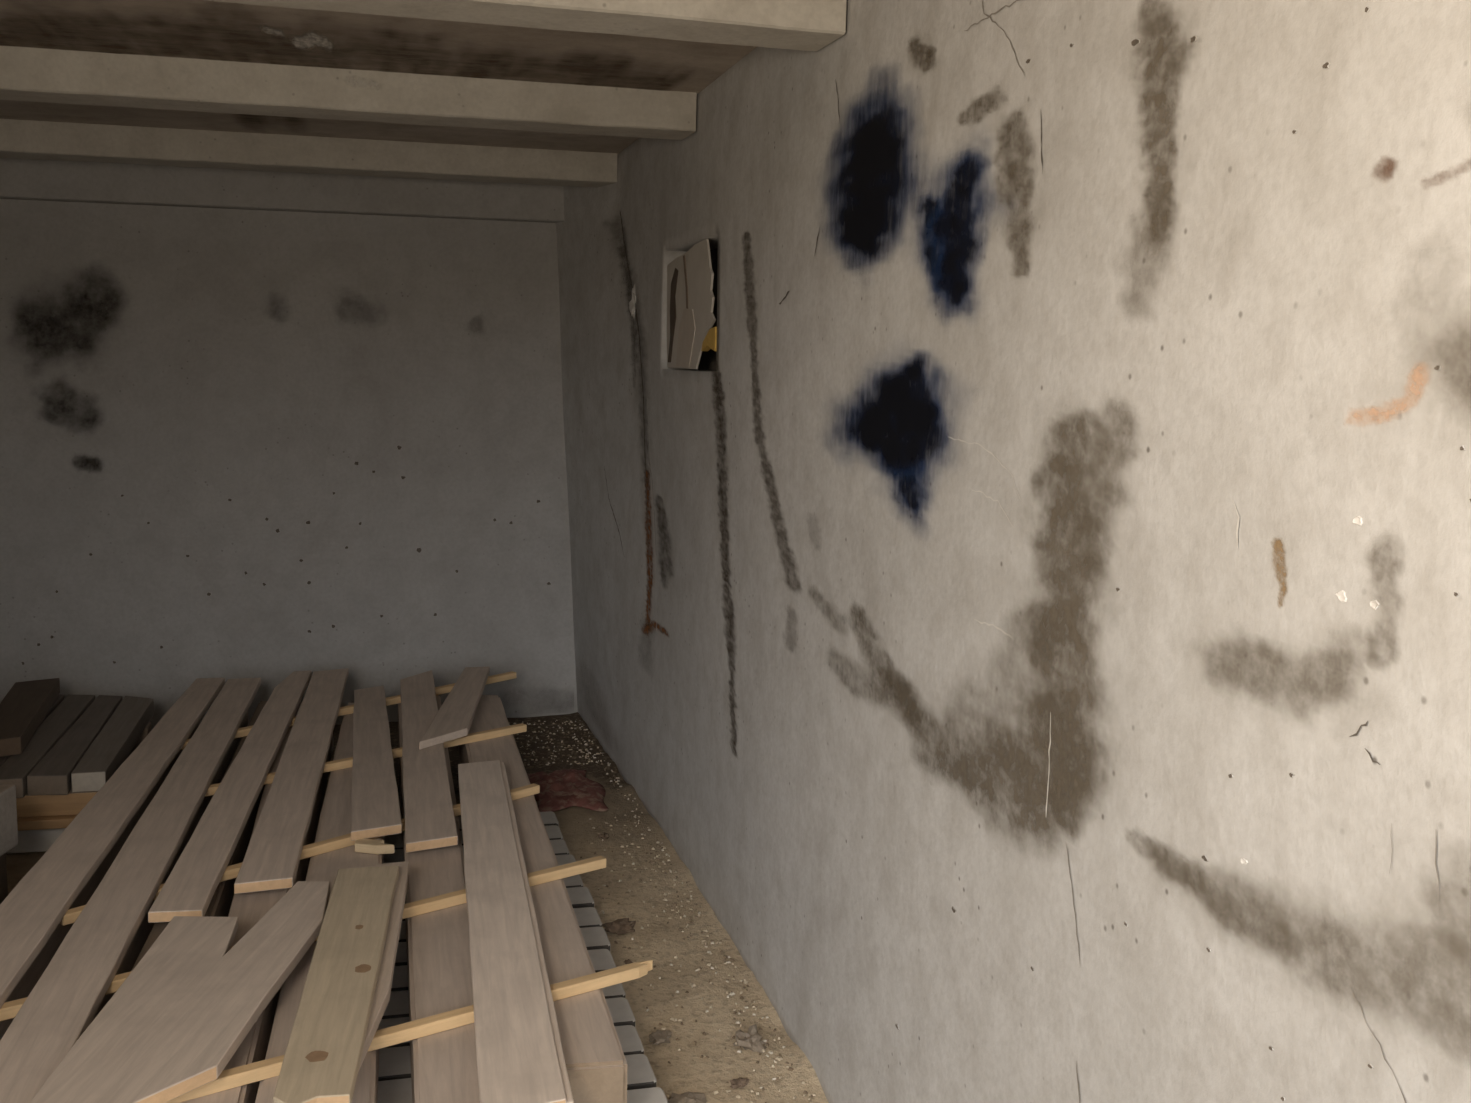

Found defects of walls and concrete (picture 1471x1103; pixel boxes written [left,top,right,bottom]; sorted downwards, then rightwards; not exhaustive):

water stain [17,276,120,358]
water stain [919,197,944,275]
water stain [960,95,995,123]
water stain [998,112,1031,275]
water stain [1141,6,1184,241]
water stain [75,456,100,470]
water stain [744,233,814,597]
rust [643,471,668,636]
water stain [715,374,736,753]